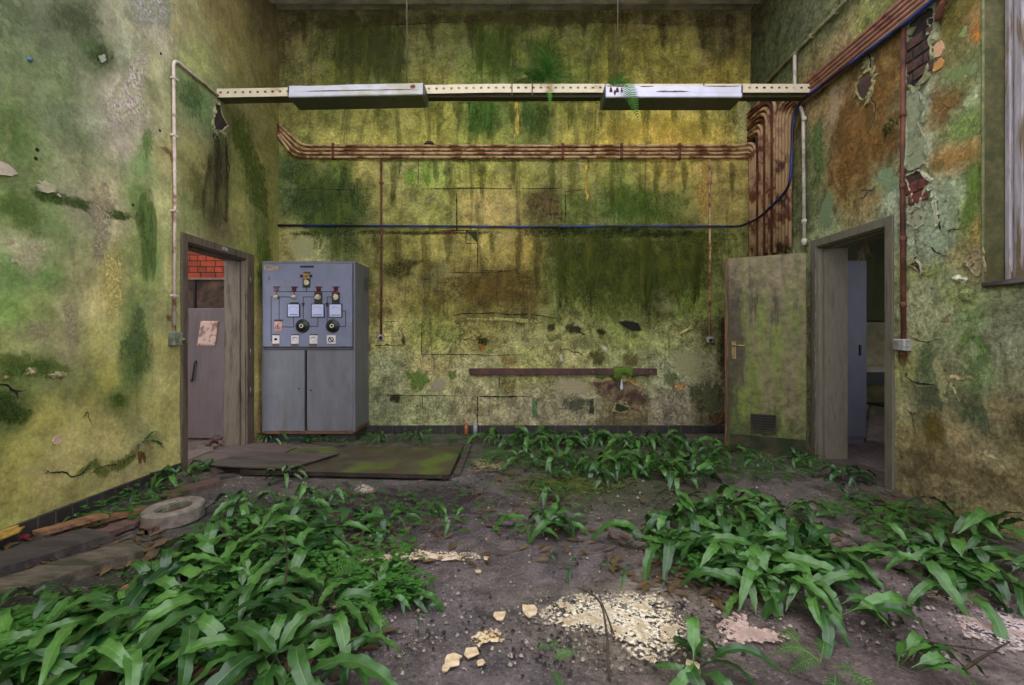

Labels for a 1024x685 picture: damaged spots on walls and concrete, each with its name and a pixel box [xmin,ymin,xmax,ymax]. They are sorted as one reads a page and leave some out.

damp [320,11,706,73]
flaking render [854,52,879,106]
damp [829,44,900,193]
flaking render [873,0,957,275]
peeling [0,161,19,176]
peeling [35,180,62,197]
damp [34,188,157,316]
damp [548,323,606,336]
crack [0,384,25,399]
damp [563,399,594,414]
flaking render [554,378,648,415]
crack [42,453,136,478]